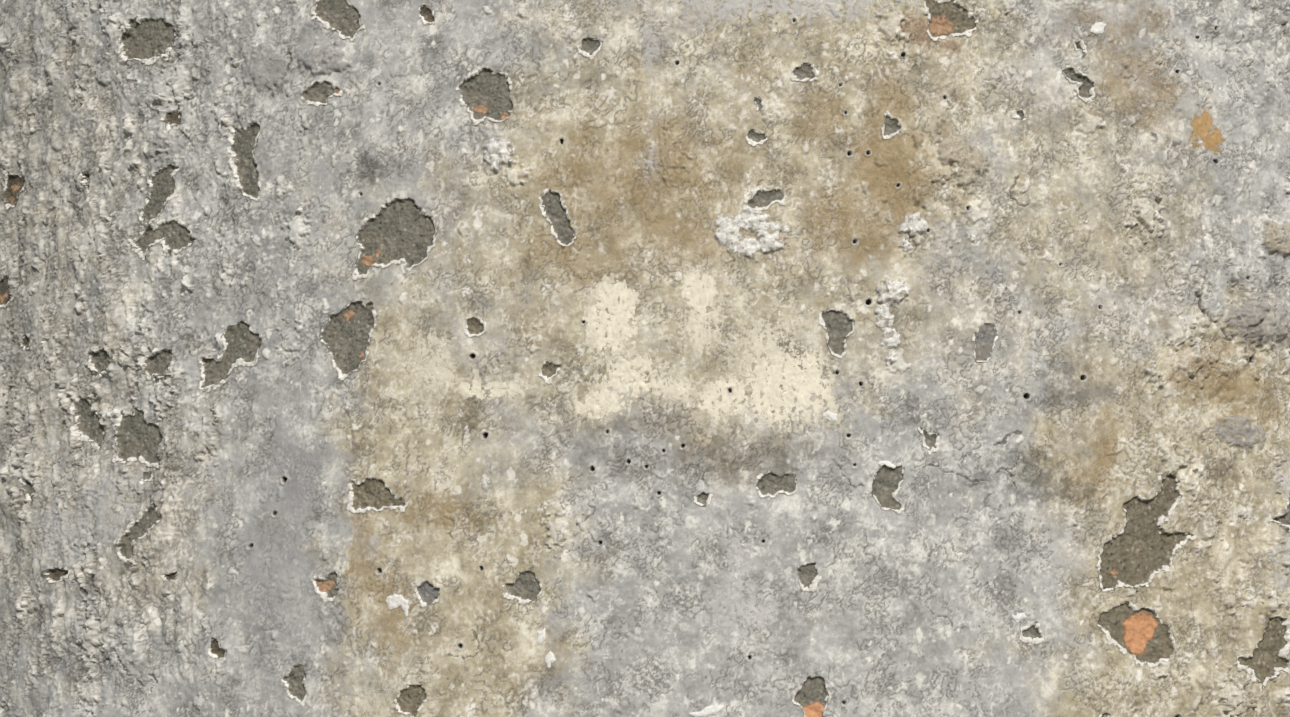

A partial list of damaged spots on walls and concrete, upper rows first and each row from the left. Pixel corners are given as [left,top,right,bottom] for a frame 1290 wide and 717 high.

spalling [118,17,176,65]
spalling [455,68,513,125]
spalling [226,120,262,203]
spalling [352,196,437,280]
spalling [198,321,261,393]
spalling [319,301,377,380]
spalling [346,476,408,514]
spalling [871,461,905,514]
spalling [1269,498,1290,531]
spalling [1096,472,1197,668]
spalling [1237,615,1290,689]
spalling [792,676,829,717]